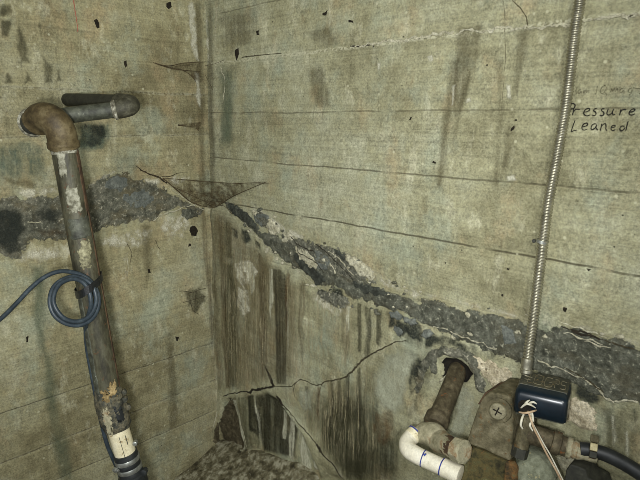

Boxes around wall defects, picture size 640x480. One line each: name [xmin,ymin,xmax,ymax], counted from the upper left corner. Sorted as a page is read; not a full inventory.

spalling [0,171,205,270]
spalling [213,398,247,449]
water stain [233,393,318,469]
water stain [263,269,294,383]
crack [224,340,406,480]
water stain [358,315,380,355]
spalling [225,202,527,437]
water stain [389,316,466,352]
spalling [532,322,640,405]
water stain [577,386,599,402]